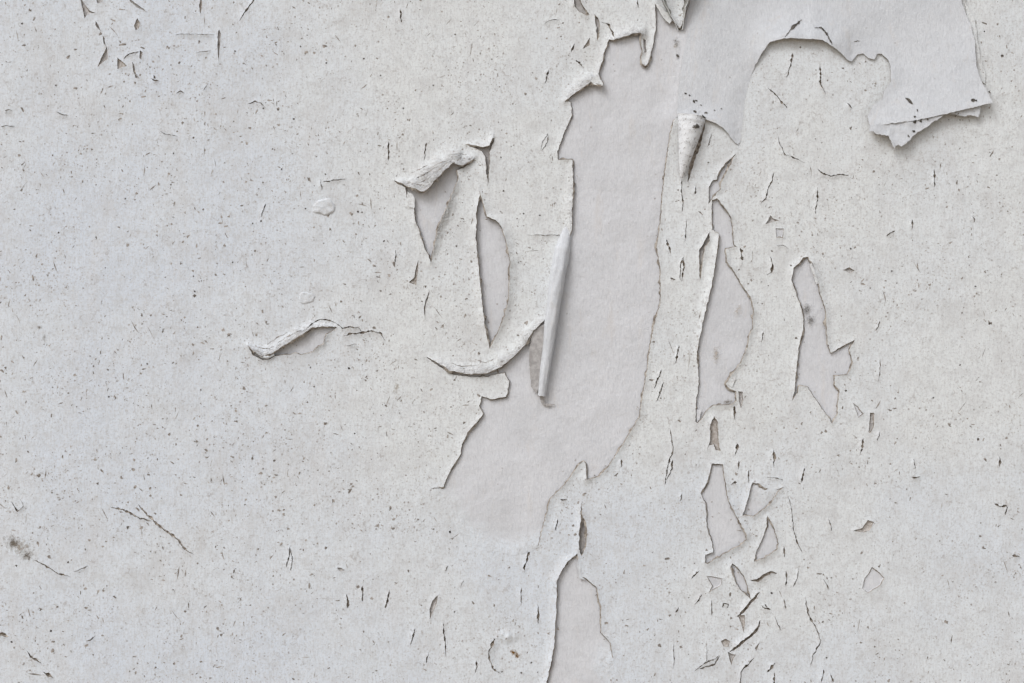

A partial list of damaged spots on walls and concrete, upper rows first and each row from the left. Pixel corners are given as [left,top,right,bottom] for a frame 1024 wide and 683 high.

peeling [241,316,343,365]
peeling [389,0,993,683]
crack [111,504,193,554]